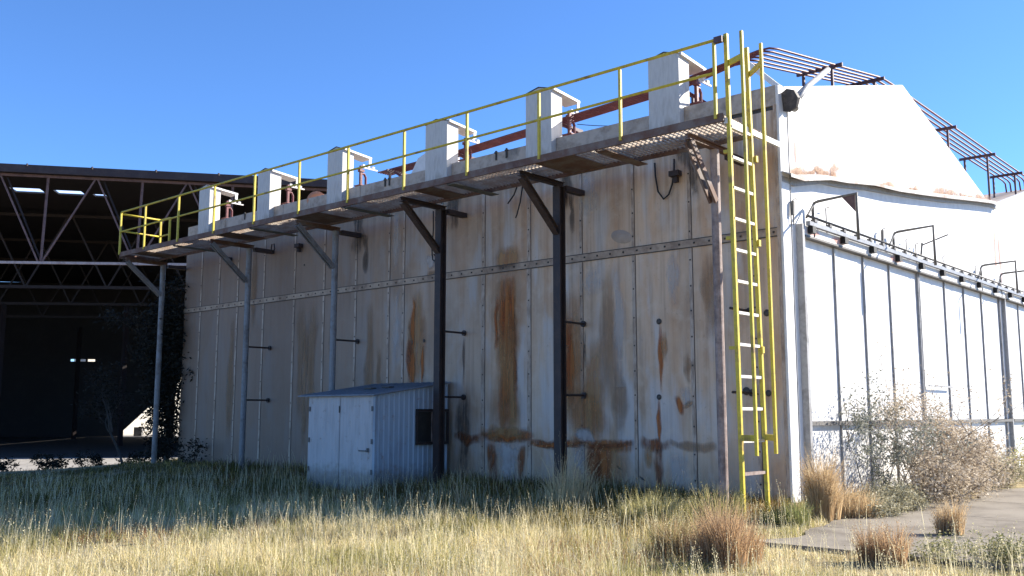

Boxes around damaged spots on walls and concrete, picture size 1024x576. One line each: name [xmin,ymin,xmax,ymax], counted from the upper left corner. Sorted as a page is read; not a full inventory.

rust [406,301,424,382]
rust [494,287,517,422]
rust [658,337,667,382]
rust [566,316,663,487]
rust [531,440,554,449]